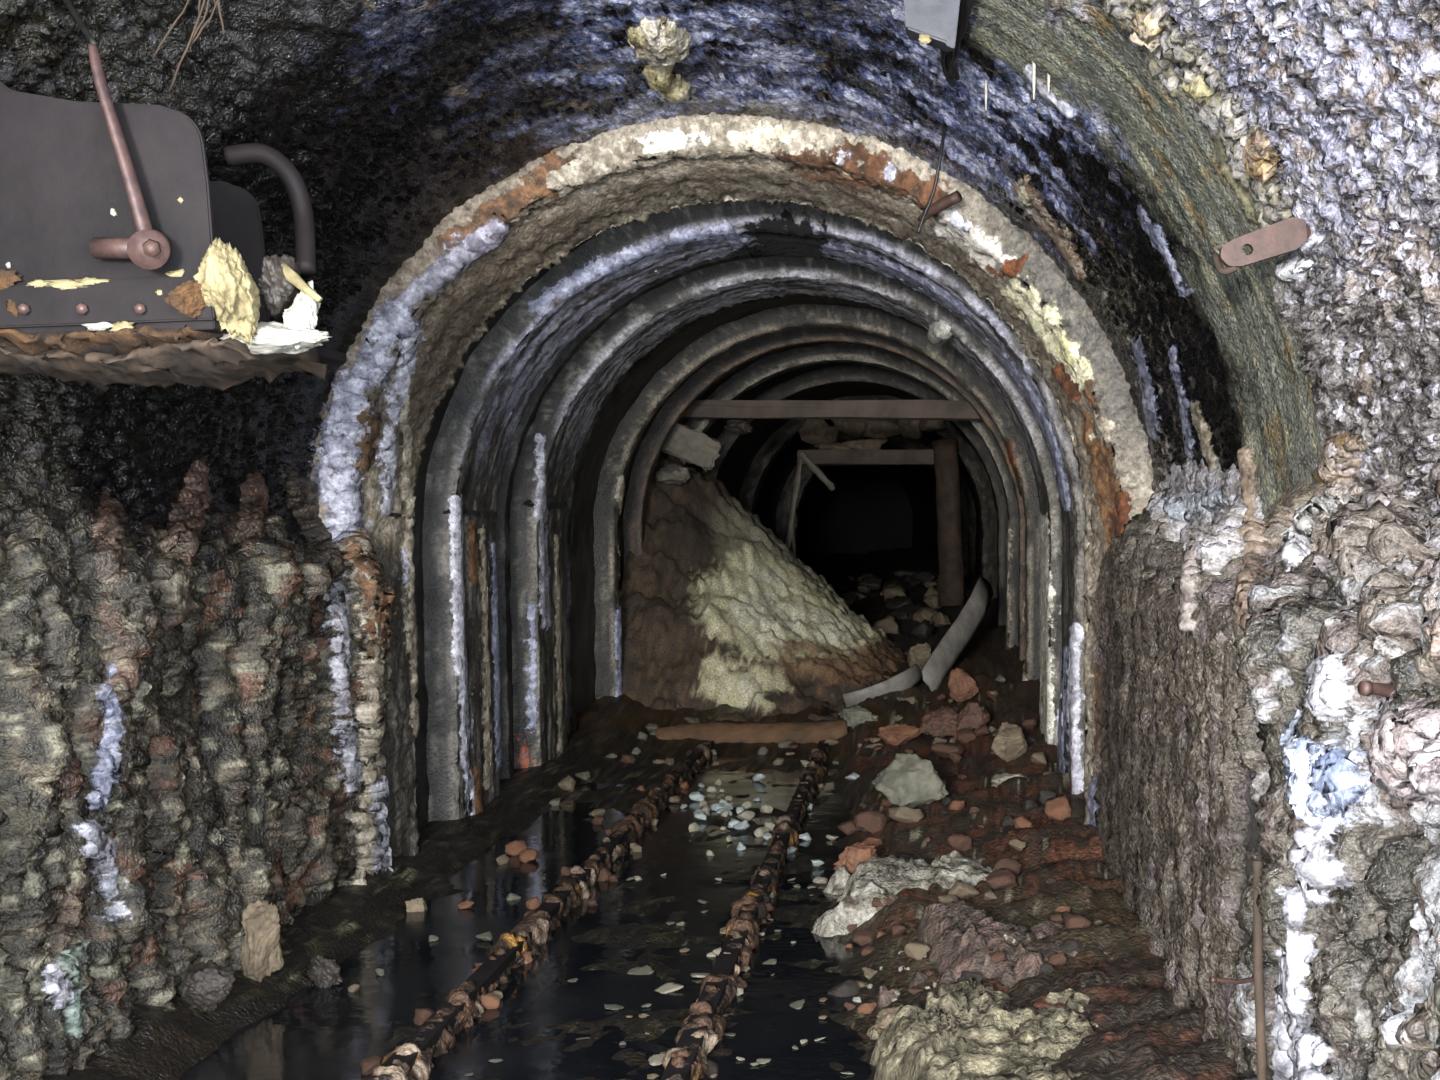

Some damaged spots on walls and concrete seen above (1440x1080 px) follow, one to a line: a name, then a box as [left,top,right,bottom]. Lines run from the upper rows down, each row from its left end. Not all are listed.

leakage [1023,64,1074,119]
leakage [1101,0,1293,228]
rust [771,137,962,223]
leakage [864,251,967,317]
rust [985,254,1028,282]
leakage [1010,171,1087,281]
leakage [1137,204,1194,297]
leakage [1129,336,1162,440]
rust [1051,362,1132,547]
leakage [322,388,420,885]
rust [1092,625,1102,819]